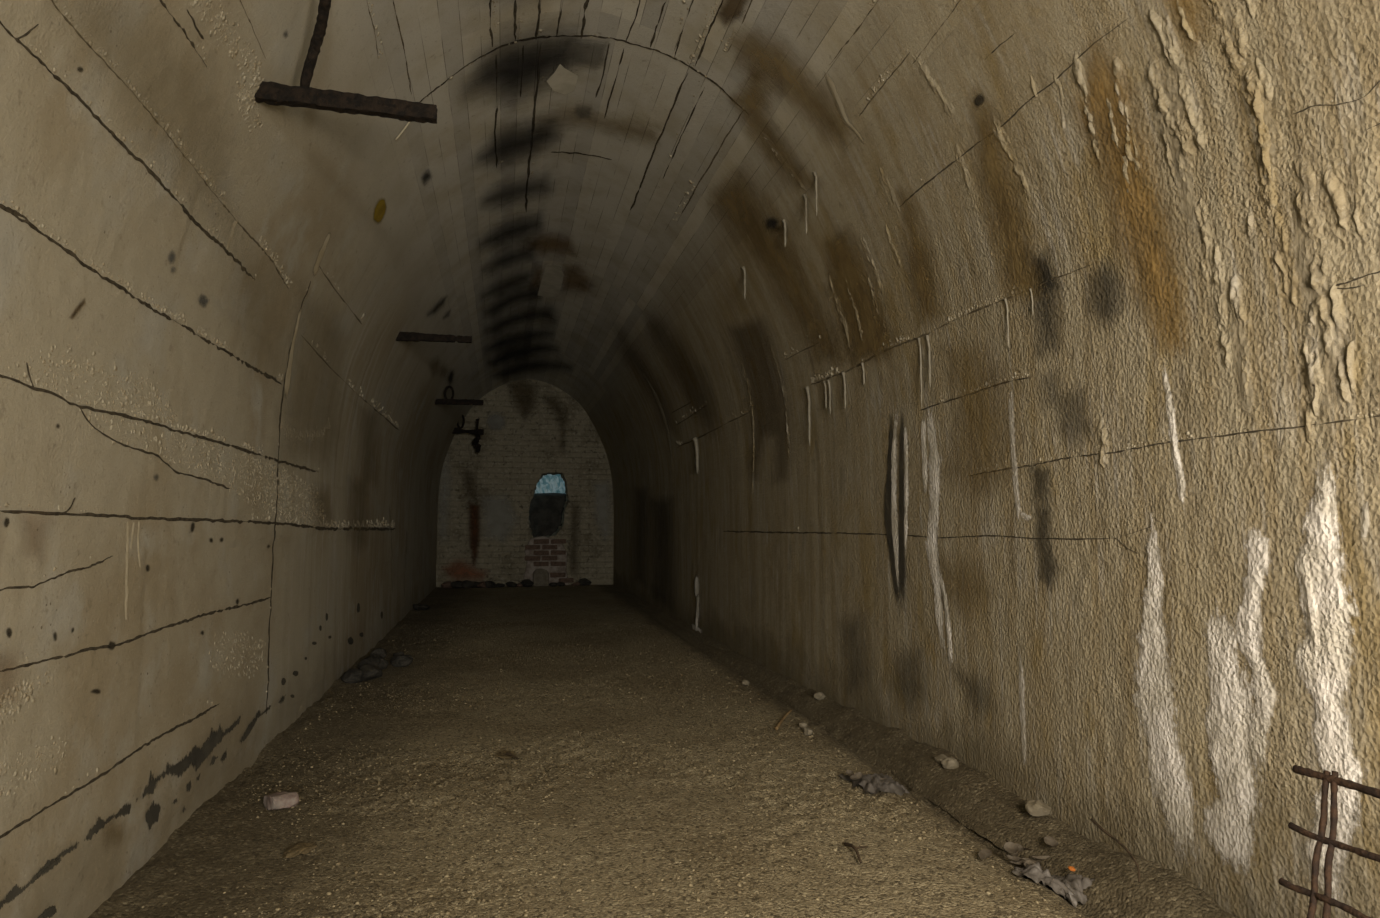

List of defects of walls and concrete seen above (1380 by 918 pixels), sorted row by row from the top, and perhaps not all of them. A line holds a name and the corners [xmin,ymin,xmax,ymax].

crack [0,21,257,280]
crack [0,194,283,384]
crack [489,0,724,212]
rust [1086,60,1177,341]
crack [0,363,395,532]
rust [469,504,479,562]
damp [884,411,953,661]
damp [1009,392,1055,584]
damp [1162,370,1186,501]
crack [0,701,219,839]
damp [1134,518,1277,873]
damp [1295,453,1363,900]